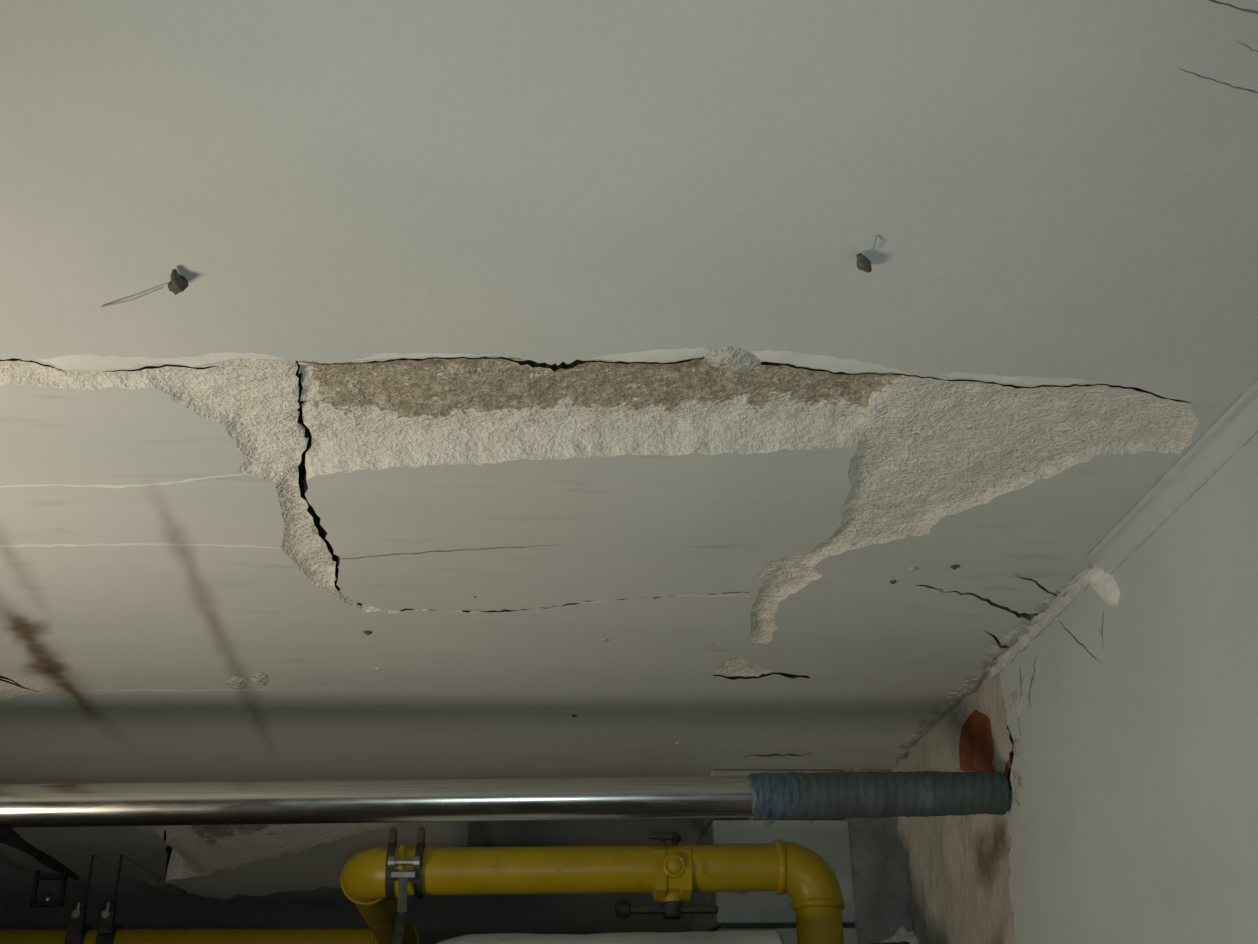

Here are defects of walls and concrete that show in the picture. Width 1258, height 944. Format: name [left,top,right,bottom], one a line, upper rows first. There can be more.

crack [0,358,67,373]
crack [105,364,218,372]
crack [761,362,1190,403]
crack [295,357,704,605]
flaking render [0,347,1199,644]
crack [0,541,282,549]
flaking render [0,669,65,700]
flaking render [714,655,772,677]
crack [915,575,1104,791]
flaking render [134,822,399,882]